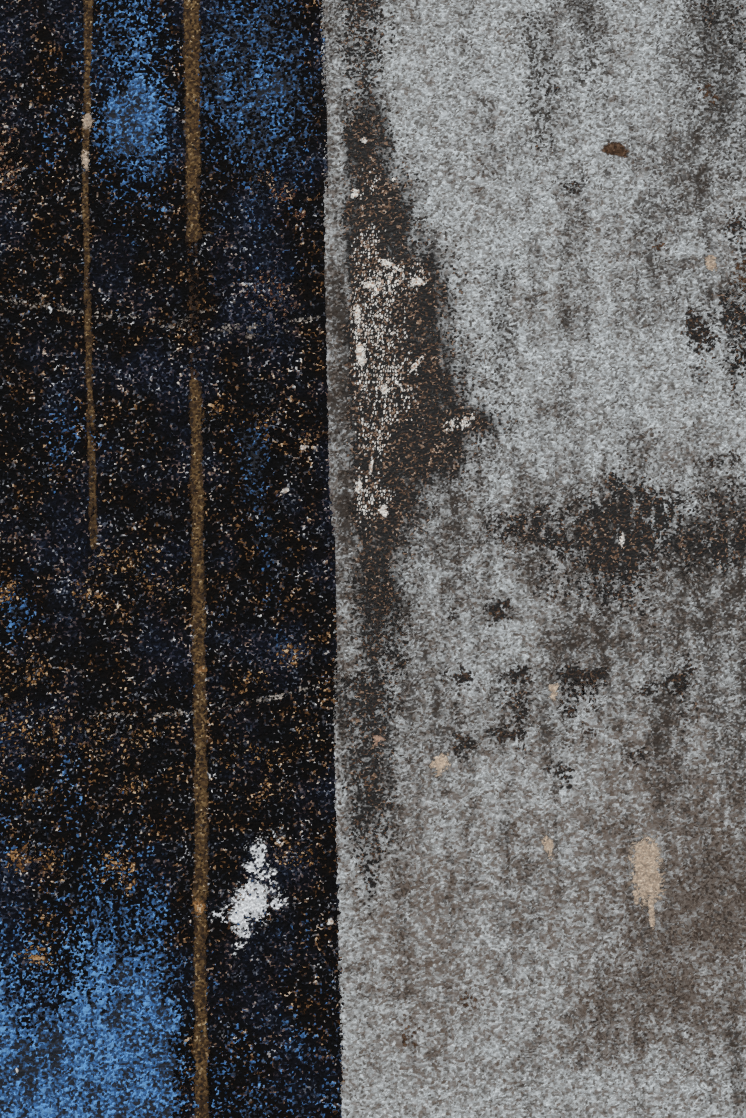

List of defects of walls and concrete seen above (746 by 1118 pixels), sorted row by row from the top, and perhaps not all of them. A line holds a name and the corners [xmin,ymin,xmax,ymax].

damp [694,450,741,468]
damp [0,0,518,1118]
damp [464,468,746,621]
damp [439,660,536,760]
damp [548,661,609,739]
damp [633,649,700,739]
peeling [213,827,289,955]